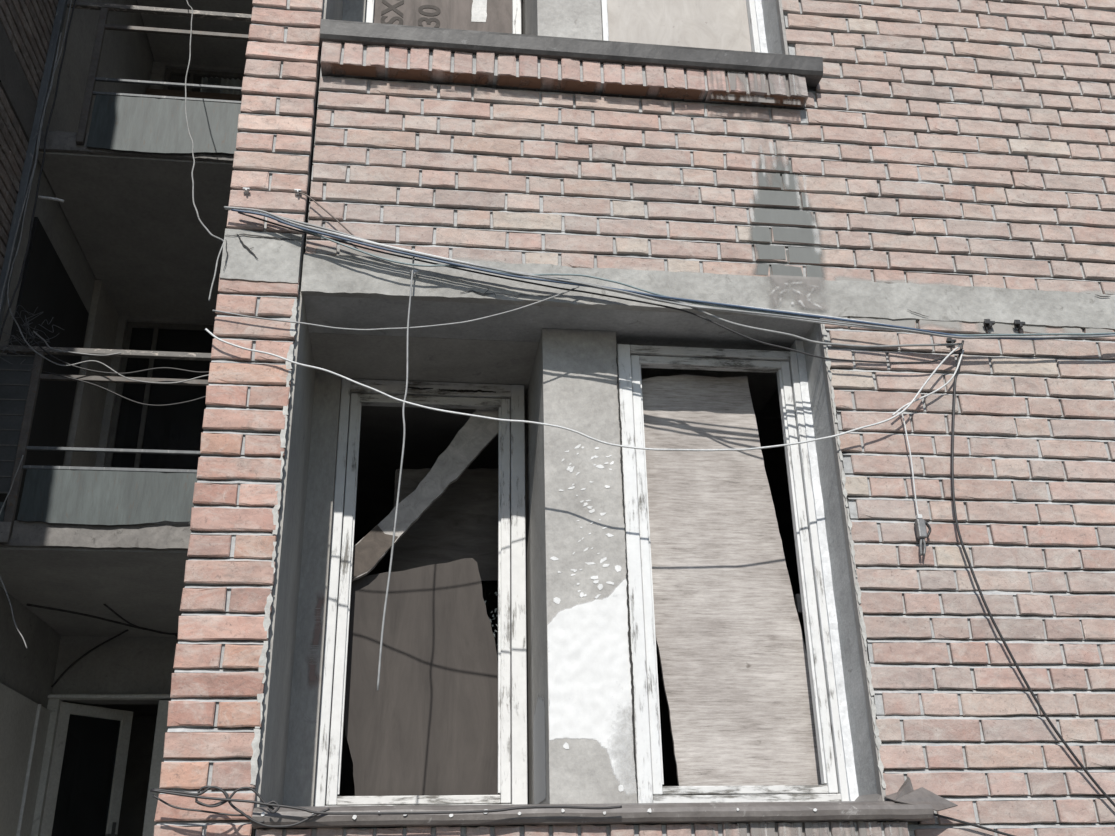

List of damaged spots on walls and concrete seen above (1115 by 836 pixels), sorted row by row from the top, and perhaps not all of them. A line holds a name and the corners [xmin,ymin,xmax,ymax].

water stain [751,156,826,309]
peeling [547,444,637,793]